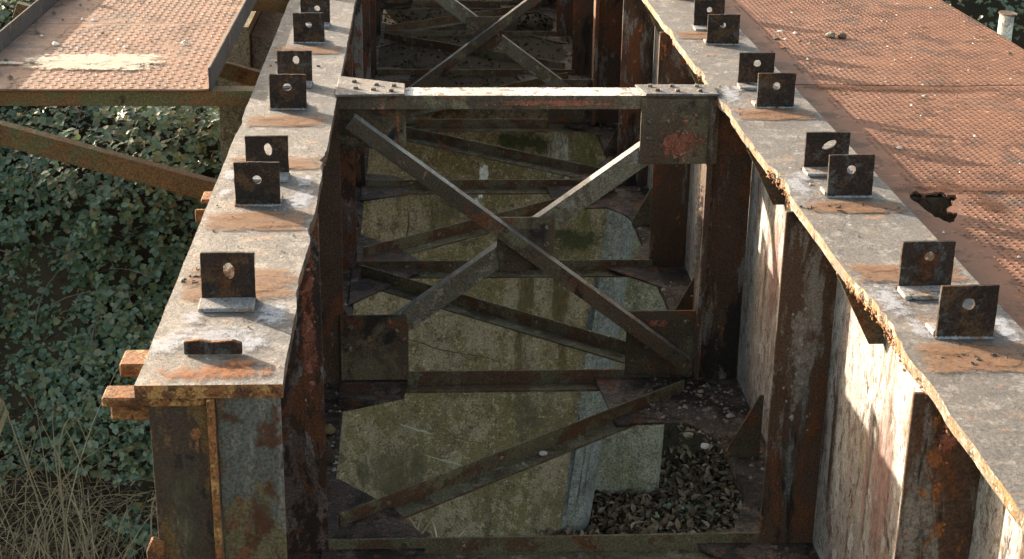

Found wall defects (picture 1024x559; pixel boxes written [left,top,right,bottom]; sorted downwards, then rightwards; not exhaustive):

rust [245,115,327,127]
rust [806,201,906,213]
rust [204,211,309,231]
rust [849,263,899,282]
rust [952,265,972,281]
rust [915,341,1024,373]
rust [159,358,273,380]
rust [818,365,842,512]
rust [926,414,944,505]